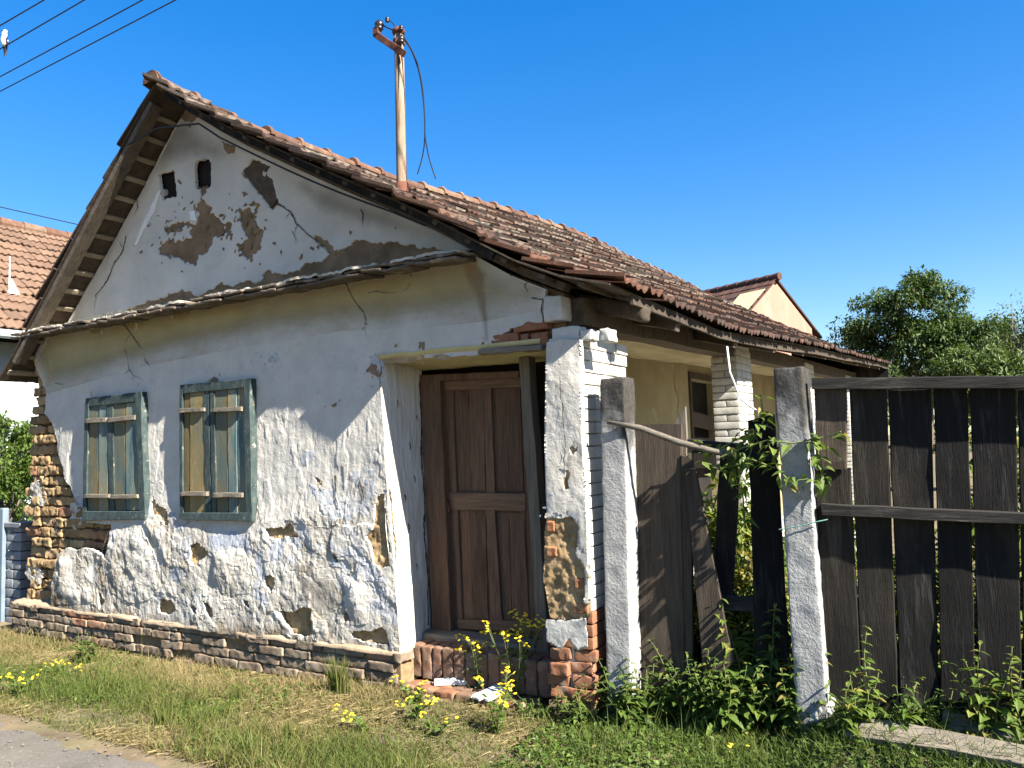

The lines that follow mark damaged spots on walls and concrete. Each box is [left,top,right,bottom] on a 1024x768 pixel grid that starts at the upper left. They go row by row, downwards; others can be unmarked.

peeling [127,159,441,331]
crack [279,204,329,253]
crack [345,272,411,333]
crack [123,324,150,382]
flaking render [150,493,249,618]
flaking render [255,518,298,542]
flaking render [355,466,406,576]
flaking render [283,601,317,642]
flaking render [340,610,394,652]
flaking render [539,493,607,722]